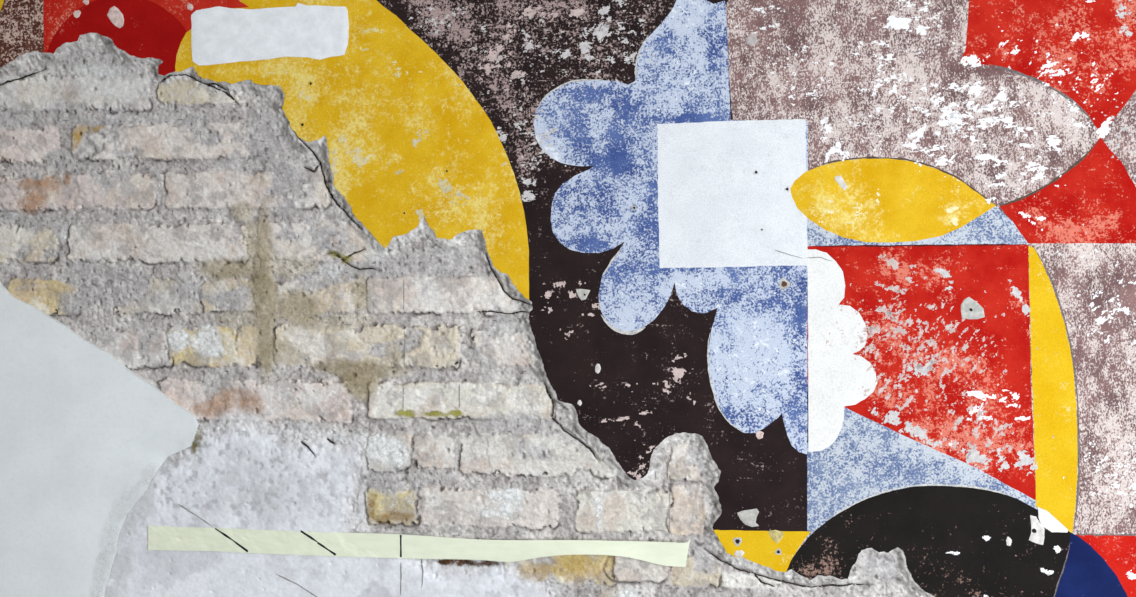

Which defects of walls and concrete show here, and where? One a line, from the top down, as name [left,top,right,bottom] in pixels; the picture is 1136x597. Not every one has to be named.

peeling [409,4,482,47]
peeling [457,0,661,202]
peeling [731,0,1136,204]
peeling [946,206,959,226]
flaking render [0,33,934,597]
peeling [1069,261,1136,345]
flaking render [826,254,1039,478]
peeling [1084,436,1136,509]
crack [178,504,211,526]
flaking render [1029,515,1061,553]
crack [276,574,317,597]
crack [400,559,424,595]